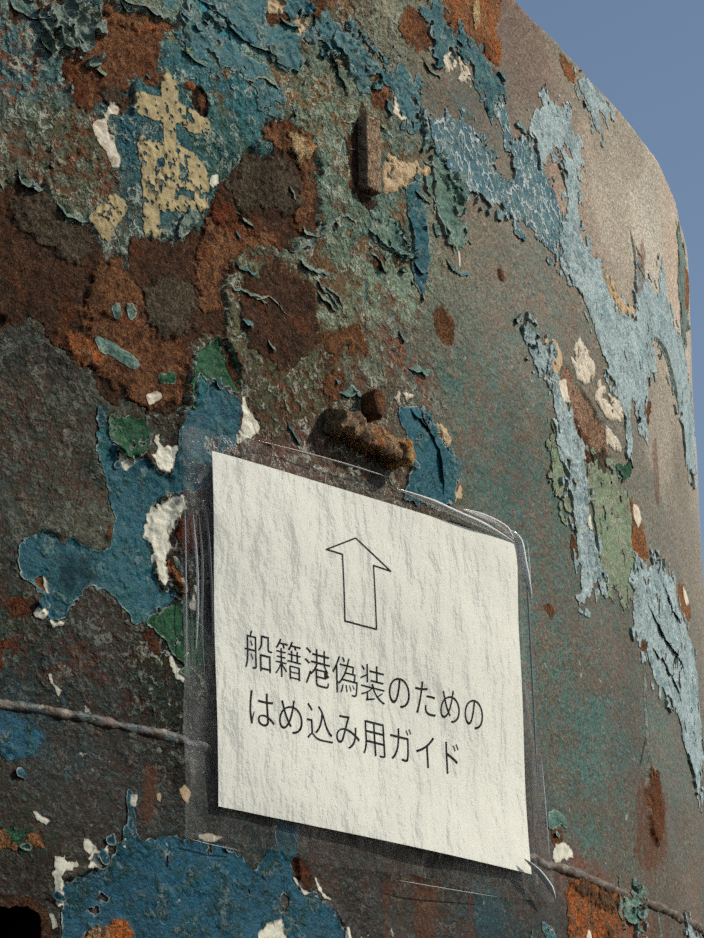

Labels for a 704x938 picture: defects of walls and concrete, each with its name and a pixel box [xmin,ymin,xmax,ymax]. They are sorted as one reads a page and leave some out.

peeling [10,0,108,69]
corrosion [442,0,502,67]
peeling [92,101,121,168]
corrosion [344,79,391,210]
corrosion [0,117,369,416]
peeling [171,0,704,813]
peeling [17,337,260,682]
corrosion [631,499,649,561]
peeling [0,711,46,779]
peeling [49,789,352,938]
corrosion [86,919,134,938]
corrosion [565,875,624,938]